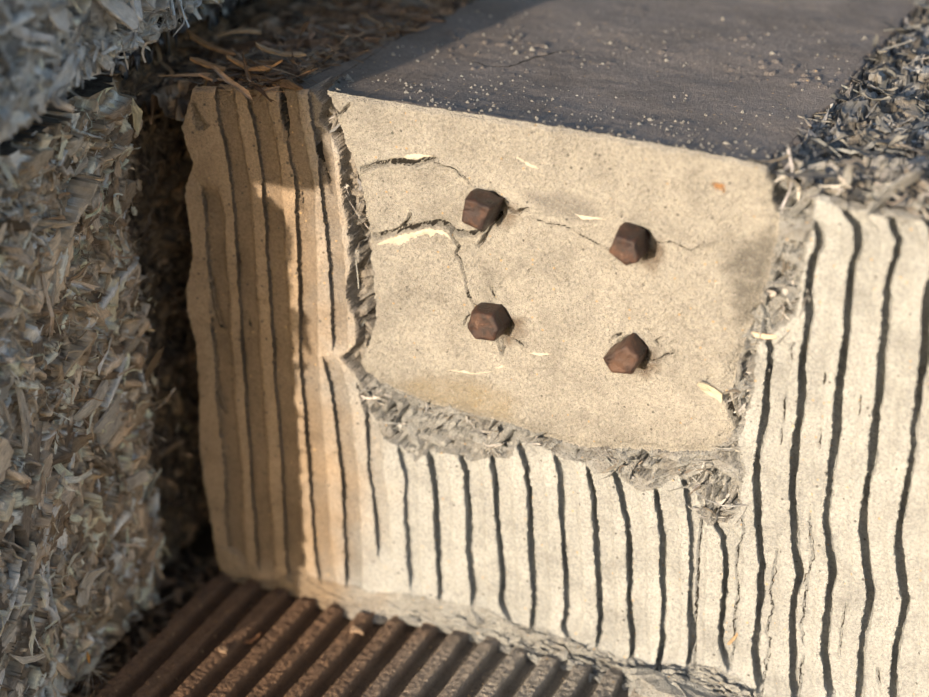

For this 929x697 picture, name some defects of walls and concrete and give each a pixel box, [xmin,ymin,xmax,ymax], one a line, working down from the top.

crack [366,157,466,178]
crack [379,207,609,259]
spalling [316,75,854,527]